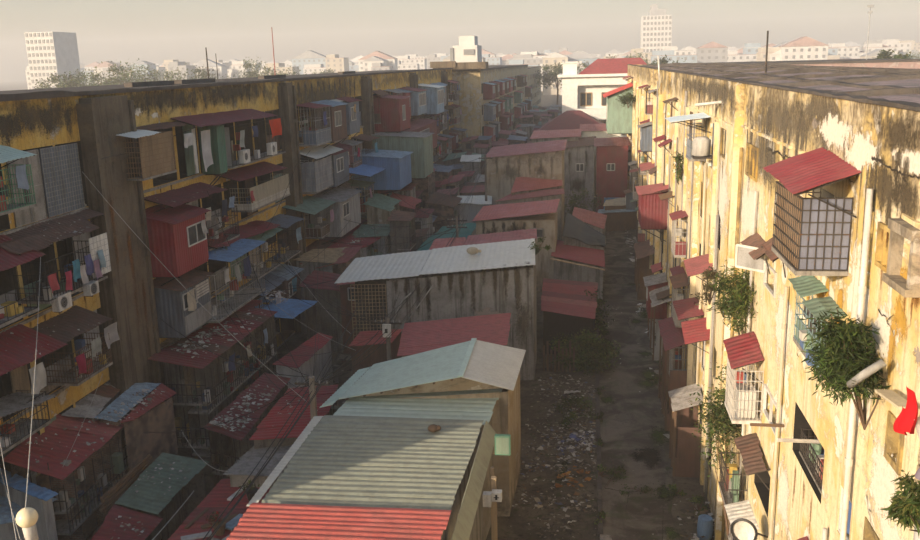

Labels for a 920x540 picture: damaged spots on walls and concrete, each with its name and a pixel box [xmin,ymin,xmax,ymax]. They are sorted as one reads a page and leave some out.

water stain [0,101,72,146]
water stain [130,81,277,116]
water stain [682,78,753,122]
water stain [747,90,842,191]
flaking render [812,113,920,176]
water stain [854,115,920,253]
crack [871,156,920,183]
water stain [393,263,531,343]